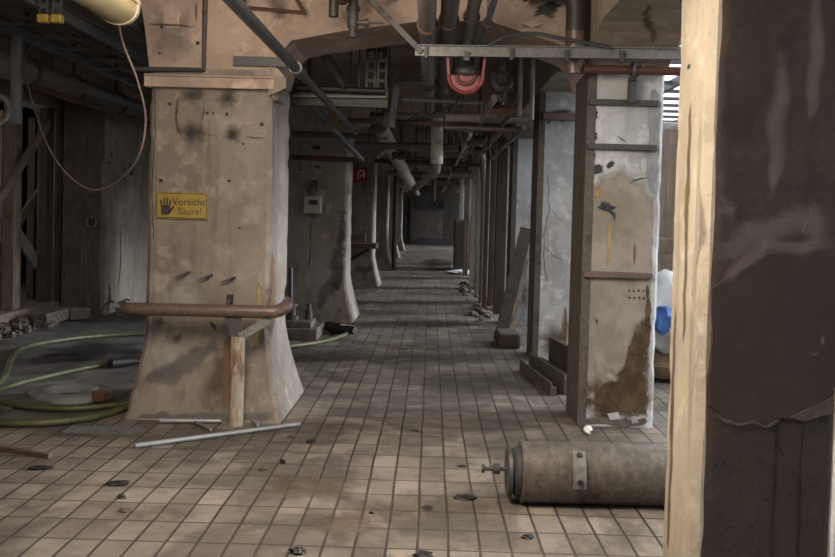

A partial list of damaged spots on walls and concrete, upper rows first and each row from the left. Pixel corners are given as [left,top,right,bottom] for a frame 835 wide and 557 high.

flaking render [708,248,835,427]